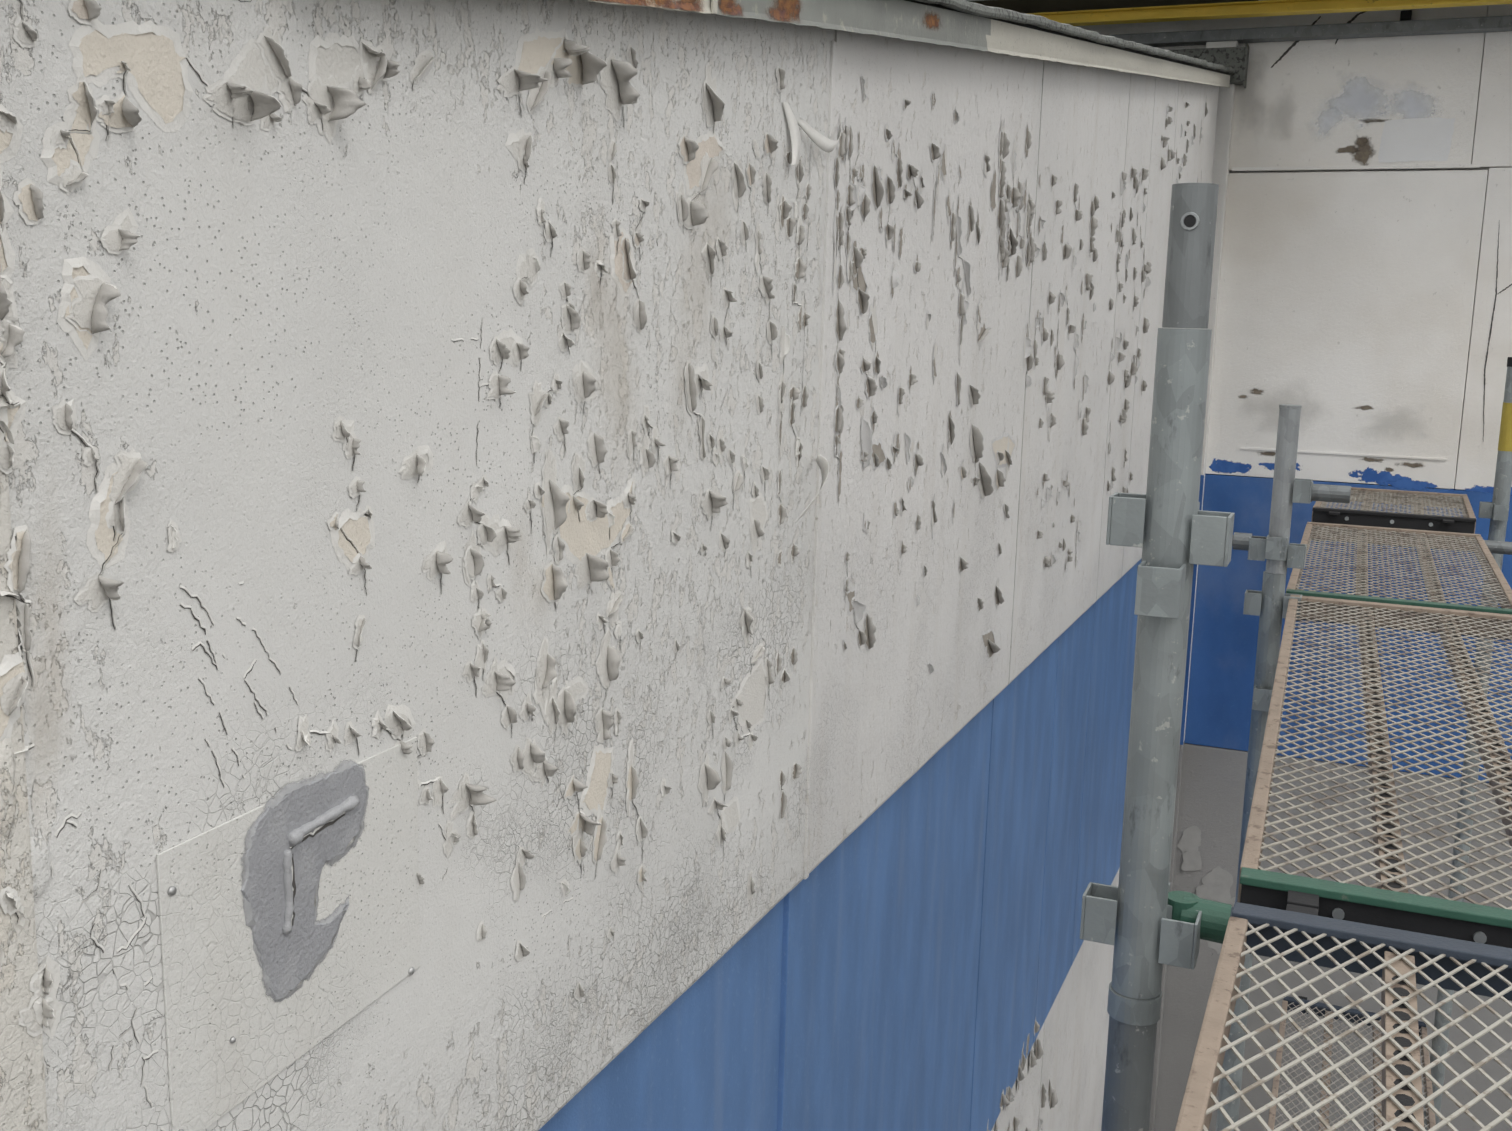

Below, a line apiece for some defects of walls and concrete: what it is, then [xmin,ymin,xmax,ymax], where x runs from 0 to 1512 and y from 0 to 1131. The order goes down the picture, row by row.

rust [595,0,743,16]
rust [769,0,800,22]
peeling [0,0,435,474]
peeling [676,62,1208,578]
peeling [421,27,679,901]
peeling [1209,458,1275,473]
peeling [1349,467,1512,495]
crack [14,743,35,754]
crack [50,811,81,877]
crack [180,581,299,787]
peeling [697,606,798,853]
crack [74,869,166,1131]